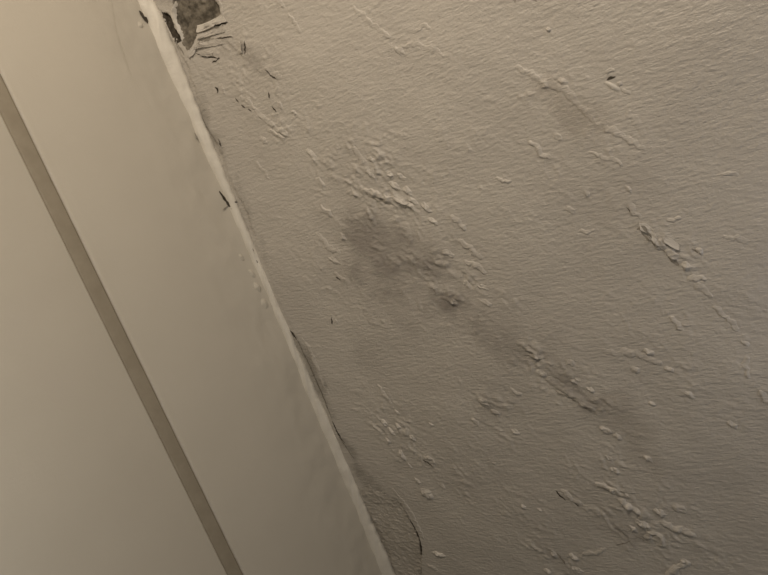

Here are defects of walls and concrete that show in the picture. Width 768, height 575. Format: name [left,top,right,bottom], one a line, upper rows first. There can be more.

flaking render [161,0,246,63]
peeling [361,484,439,575]